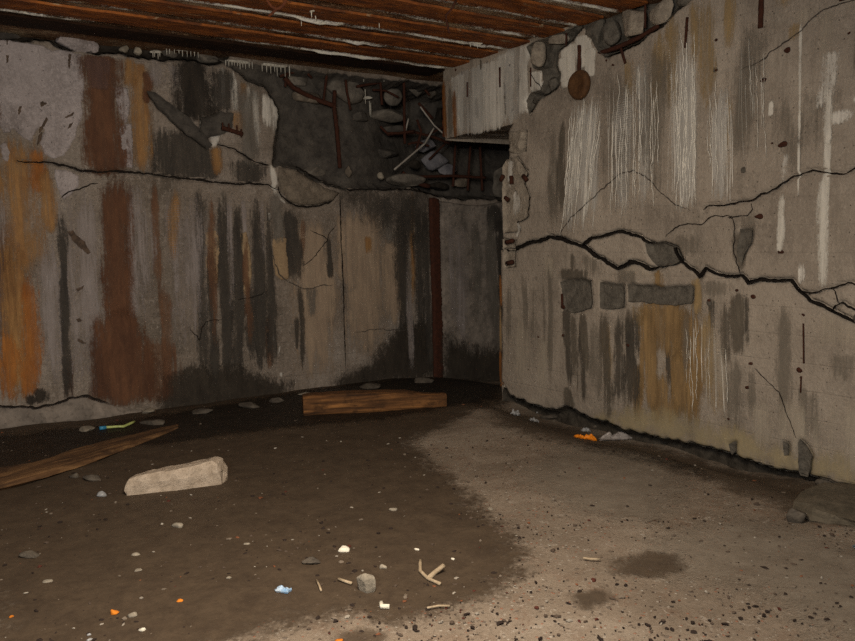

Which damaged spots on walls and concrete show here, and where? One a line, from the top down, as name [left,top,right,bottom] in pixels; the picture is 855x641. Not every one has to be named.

corrosion [0,142,57,397]
peeling [0,37,84,163]
corrosion [77,54,181,406]
crack [17,144,428,368]
leakage [150,60,316,380]
leakage [185,0,386,60]
spalling [94,45,530,268]
spalling [526,0,689,114]
leakage [548,30,696,232]
crack [502,167,855,323]
crack [0,394,111,409]
leakage [0,377,855,641]